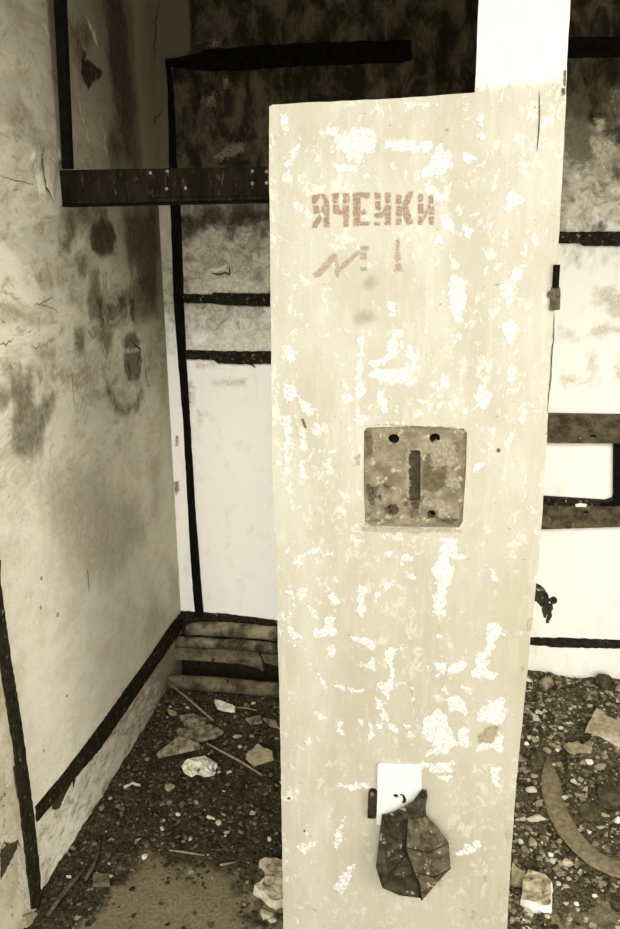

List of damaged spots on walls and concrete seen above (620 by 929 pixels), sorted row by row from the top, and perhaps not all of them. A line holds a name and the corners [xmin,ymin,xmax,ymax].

peeling [319,126,477,206]
damp [565,120,591,162]
damp [77,208,157,412]
peeling [335,301,420,413]
peeling [492,264,527,392]
damp [13,381,51,454]
peeling [281,384,338,481]
corrosion [366,483,423,521]
peeling [285,577,341,657]
peeling [431,538,469,616]
peeling [348,622,513,782]
peeling [456,840,482,856]